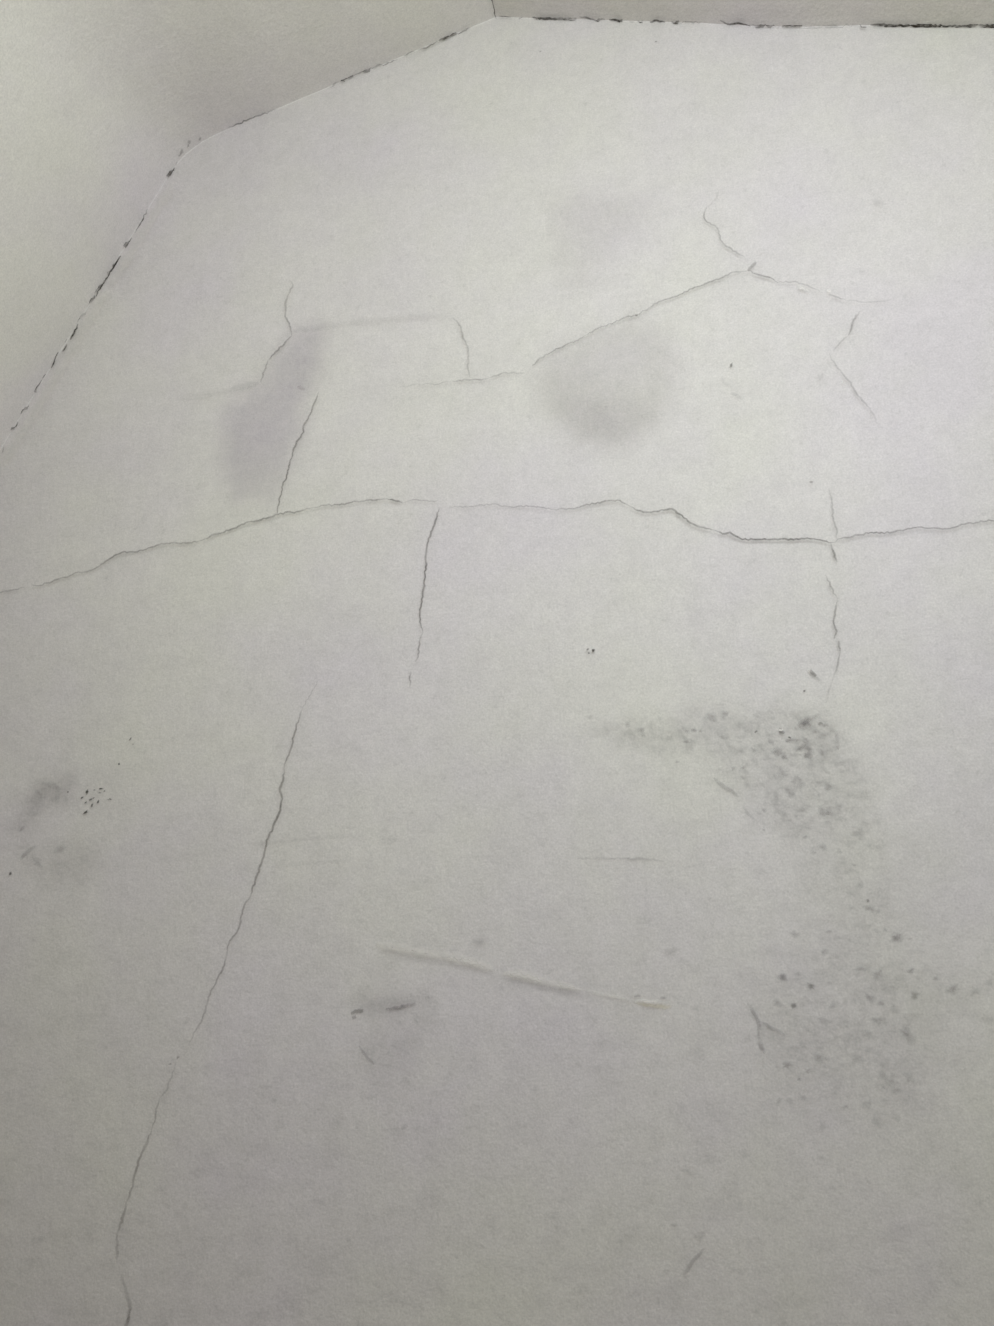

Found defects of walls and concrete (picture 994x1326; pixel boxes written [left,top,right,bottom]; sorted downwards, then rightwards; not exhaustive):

crack [35,215,144,390]
crack [723,532,835,556]